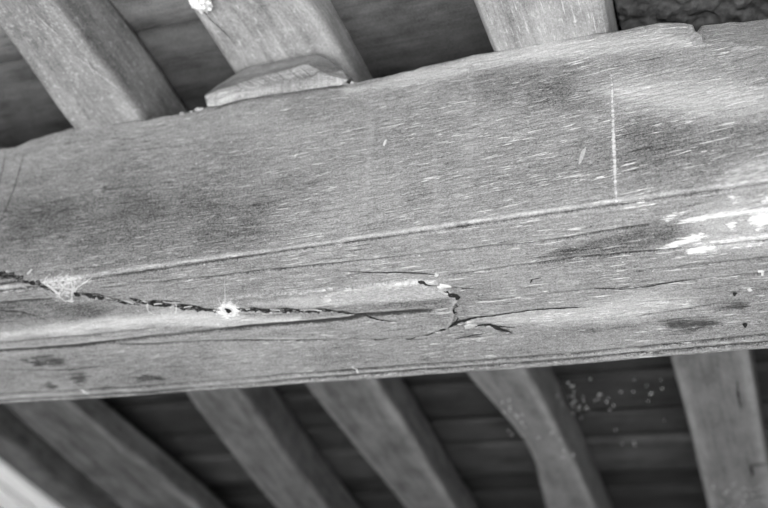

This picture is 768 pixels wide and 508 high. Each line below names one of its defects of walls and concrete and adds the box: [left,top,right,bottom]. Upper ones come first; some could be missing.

crack [0,269,59,293]
crack [348,269,435,277]
crack [82,293,398,340]
crack [407,307,580,340]